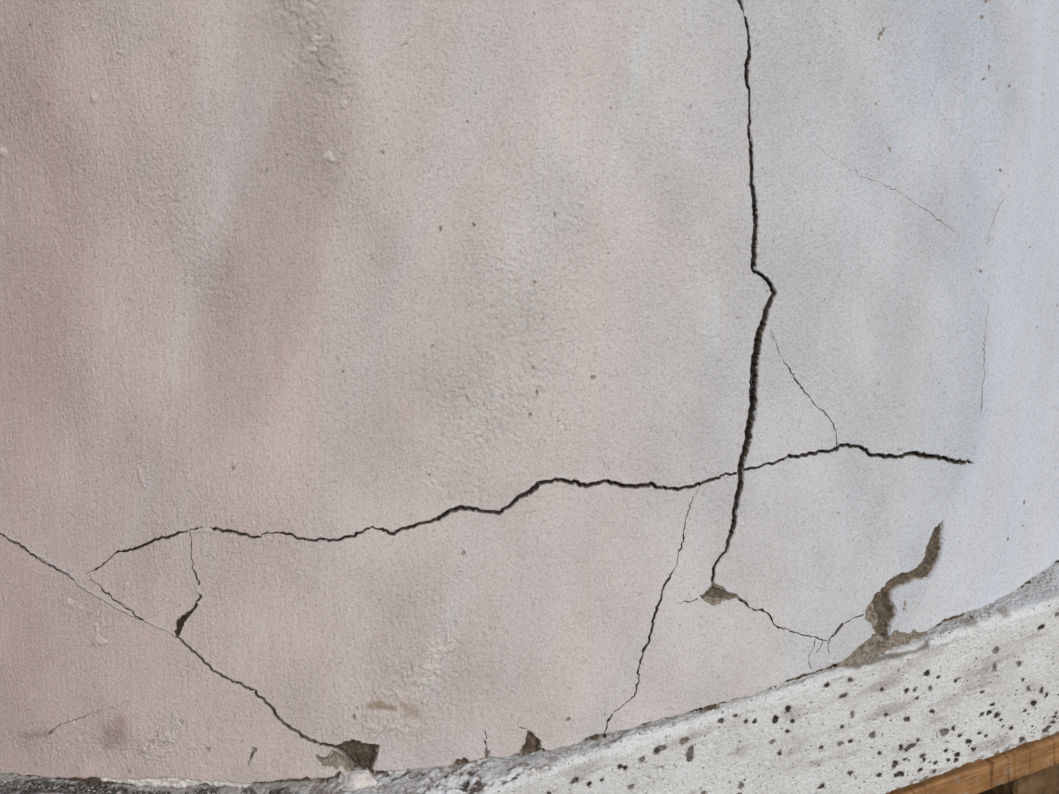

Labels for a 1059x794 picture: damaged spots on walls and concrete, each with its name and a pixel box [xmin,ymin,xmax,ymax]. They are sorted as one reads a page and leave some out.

crack [87,0,975,738]
crack [0,533,75,581]
spalling [767,522,963,698]
crack [48,703,123,735]
peeling [0,632,463,794]
crack [173,636,366,770]
spalling [859,726,988,789]
spalling [978,656,1059,742]